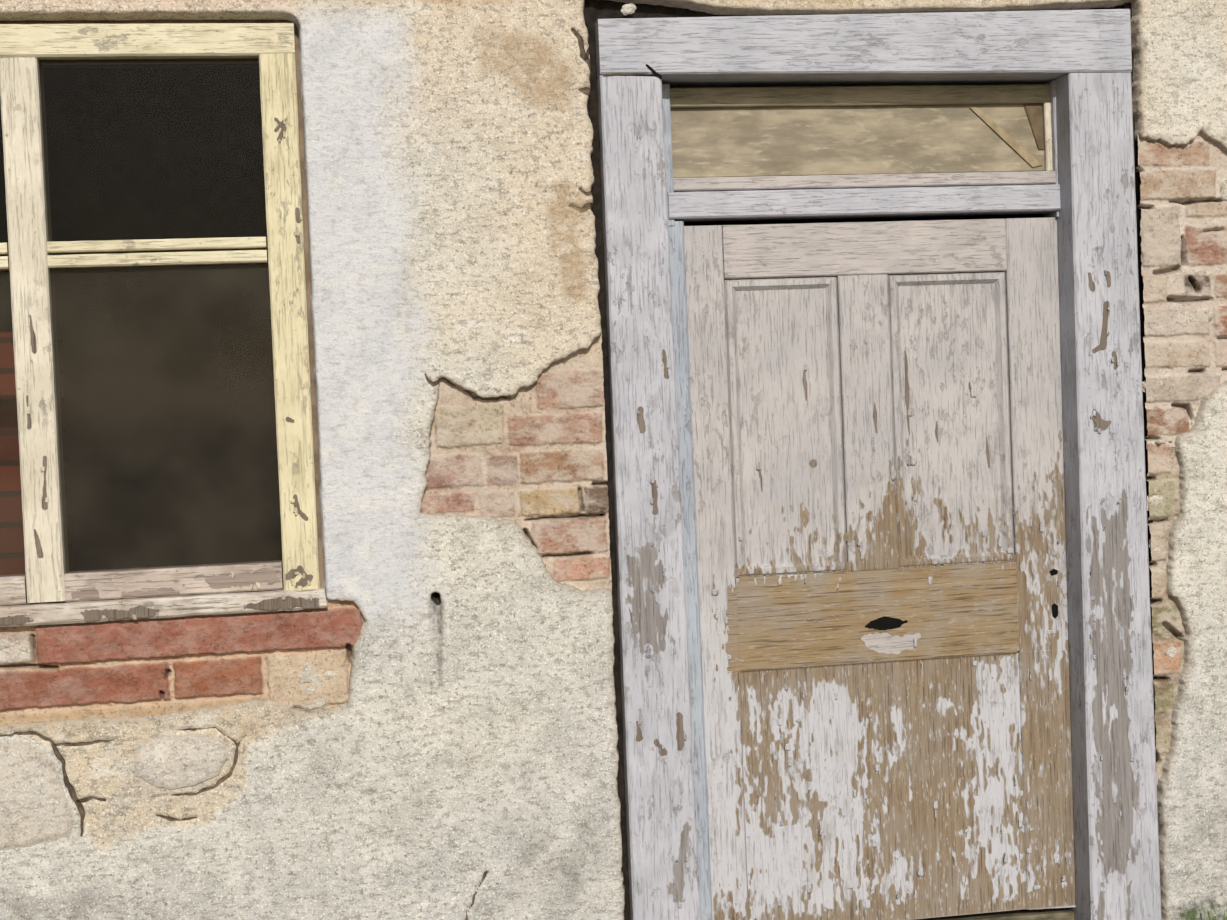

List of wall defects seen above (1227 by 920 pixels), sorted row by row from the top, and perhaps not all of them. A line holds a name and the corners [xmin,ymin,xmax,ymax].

spalling [421,333,612,591]
peeling [637,406,646,433]
peeling [650,478,658,515]
peeling [662,349,670,379]
spalling [1136,134,1227,785]
spalling [0,565,365,725]
peeling [626,542,676,658]